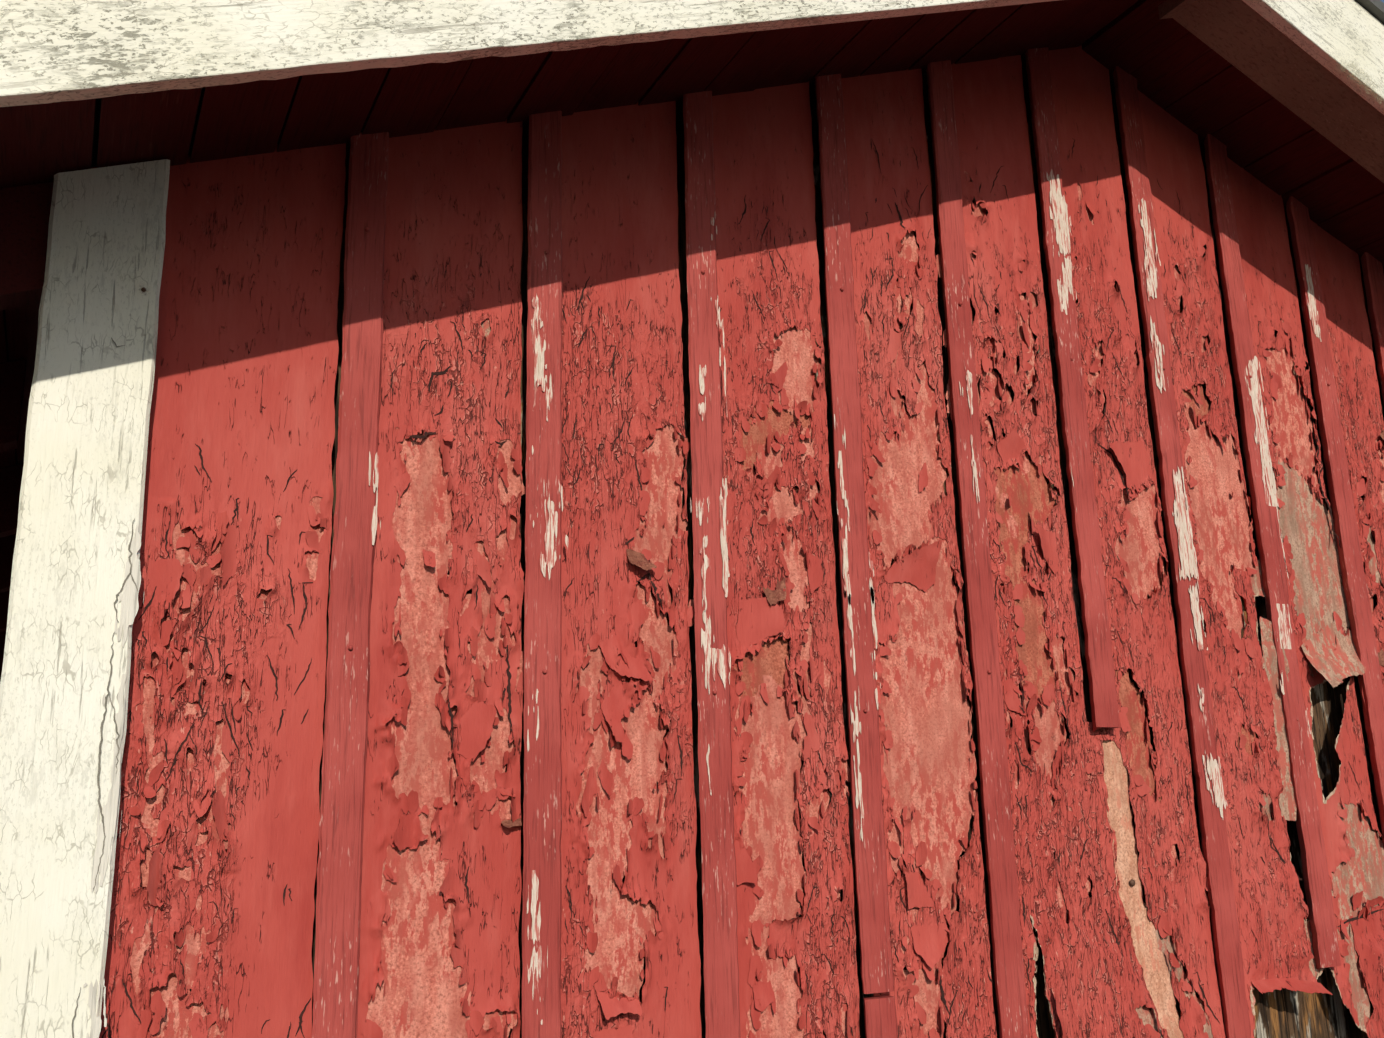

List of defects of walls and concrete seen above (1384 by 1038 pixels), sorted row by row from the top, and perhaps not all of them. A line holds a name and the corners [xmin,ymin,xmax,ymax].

peeling [1044,169,1096,315]
peeling [1088,198,1350,821]
peeling [576,231,1076,1038]
peeling [91,511,238,1038]
crack [1015,704,1033,818]
crack [72,979,141,1038]
crack [805,887,849,989]
crack [893,864,915,962]
crack [937,913,995,1038]
crack [1022,838,1089,984]
peeling [1086,669,1218,1038]
peeling [1331,797,1384,1029]